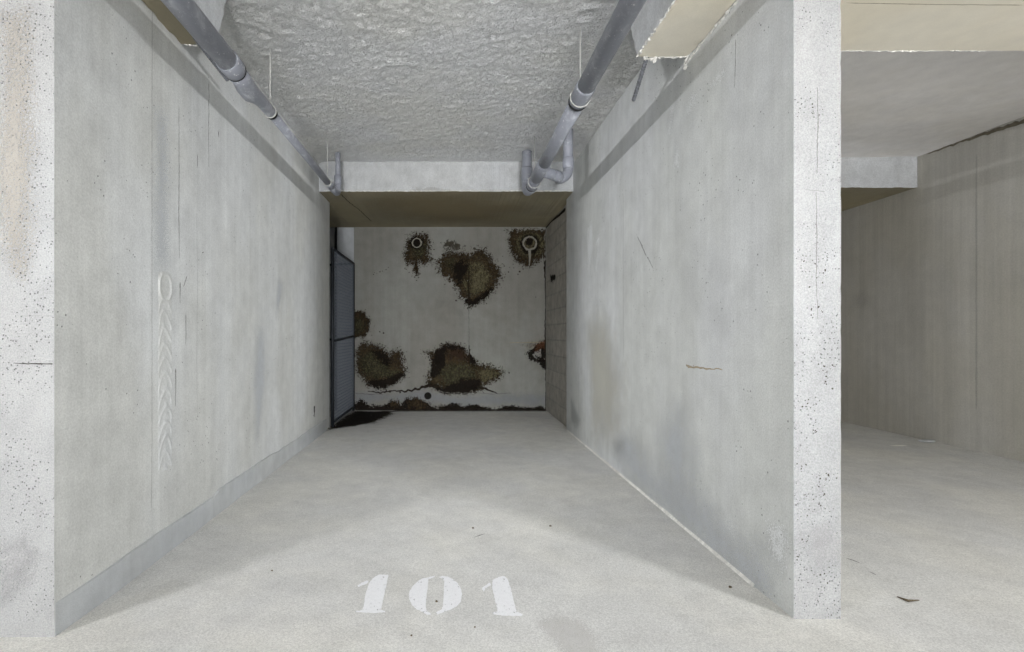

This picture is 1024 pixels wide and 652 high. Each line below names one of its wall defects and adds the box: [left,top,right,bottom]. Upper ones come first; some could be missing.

crack [356,346,506,395]
rust [525,340,545,369]